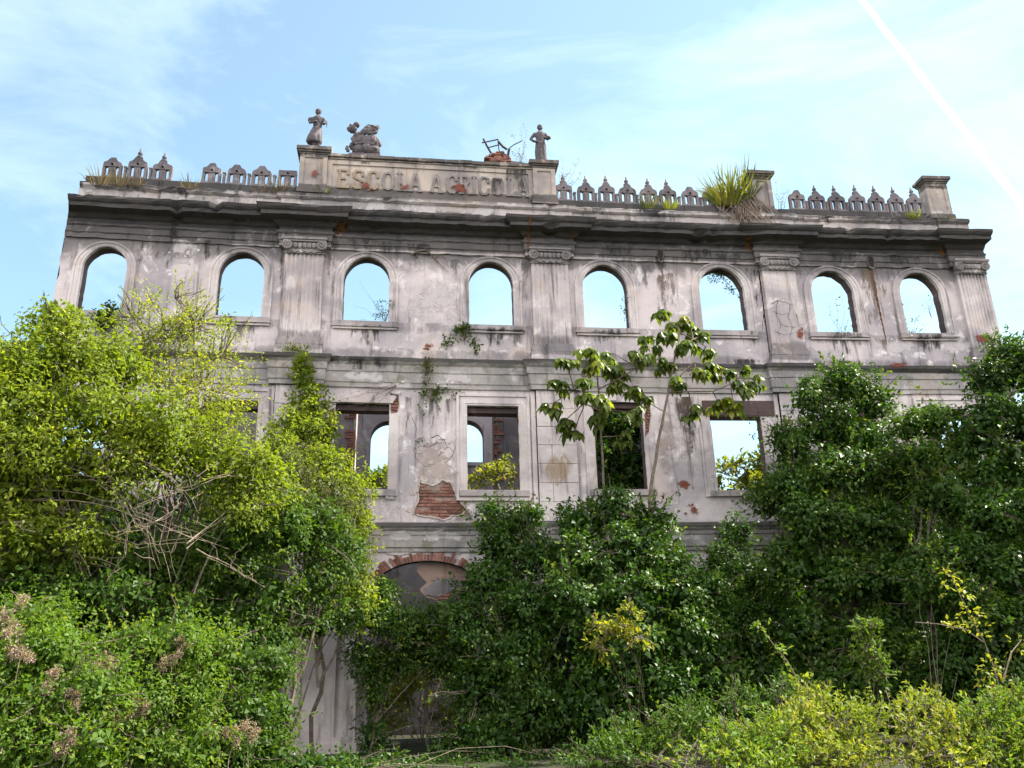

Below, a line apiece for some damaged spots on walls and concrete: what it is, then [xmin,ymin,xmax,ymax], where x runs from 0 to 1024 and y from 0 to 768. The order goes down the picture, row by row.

water stain [607,246,675,309]
crack [758,270,803,353]
corrosion [862,269,886,318]
water stain [676,397,696,451]
flaking render [368,476,473,602]